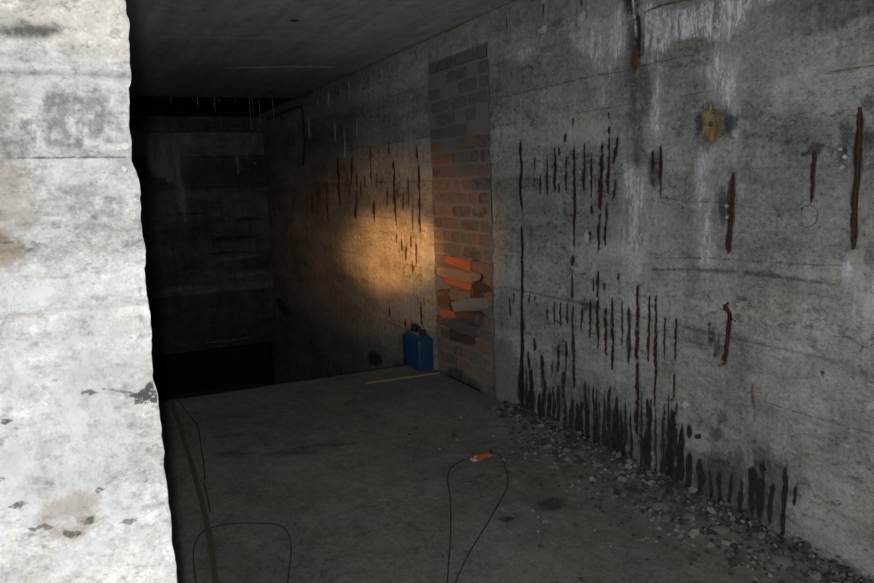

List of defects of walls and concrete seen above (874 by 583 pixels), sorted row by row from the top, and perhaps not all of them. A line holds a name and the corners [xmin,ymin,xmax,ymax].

water stain [3,25,56,37]
water stain [573,0,760,69]
water stain [621,170,645,272]
corrosion [534,112,677,434]
water stain [520,338,797,536]